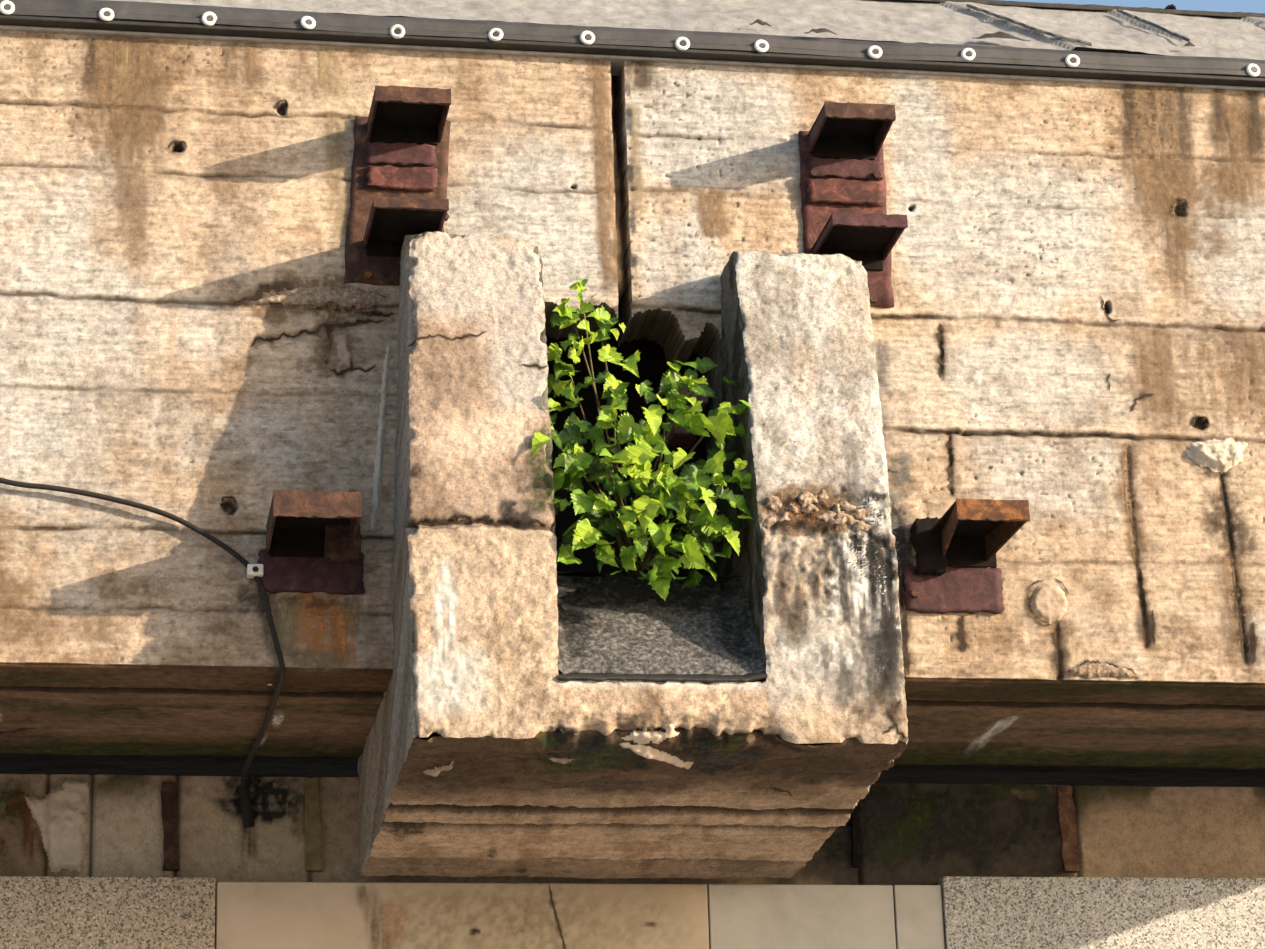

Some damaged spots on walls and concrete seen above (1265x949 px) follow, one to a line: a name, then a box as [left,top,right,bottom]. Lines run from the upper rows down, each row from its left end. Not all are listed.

damp [74,38,172,245]
damp [1124,84,1265,288]
crack [936,323,945,378]
crack [945,435,954,495]
spalling [760,484,873,536]
crack [1119,445,1156,648]
crack [1220,474,1258,665]
rust [274,594,359,670]
damp [870,549,899,679]
spalling [418,758,490,790]
spalling [525,724,875,792]
spalling [387,822,424,834]